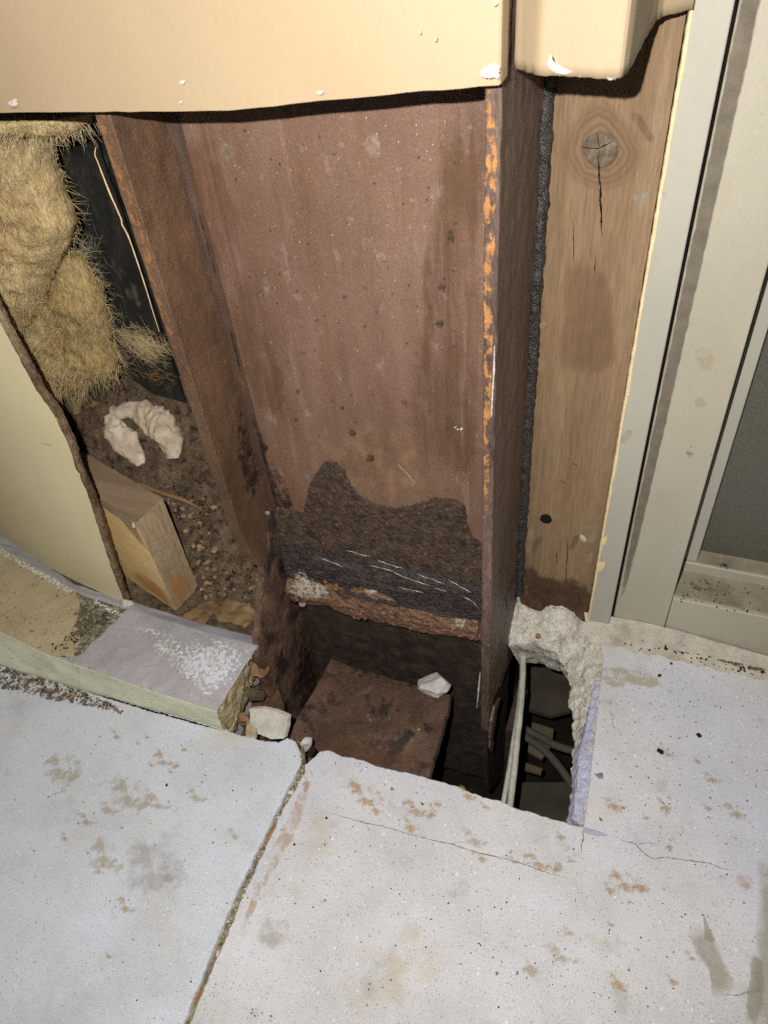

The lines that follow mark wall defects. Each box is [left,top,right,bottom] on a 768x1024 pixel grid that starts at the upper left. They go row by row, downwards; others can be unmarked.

crack [580,135,612,232]
rust [483,90,497,511]
leakage [520,569,591,622]
spalling [508,600,603,827]
crack [320,810,572,883]
crack [613,835,729,870]